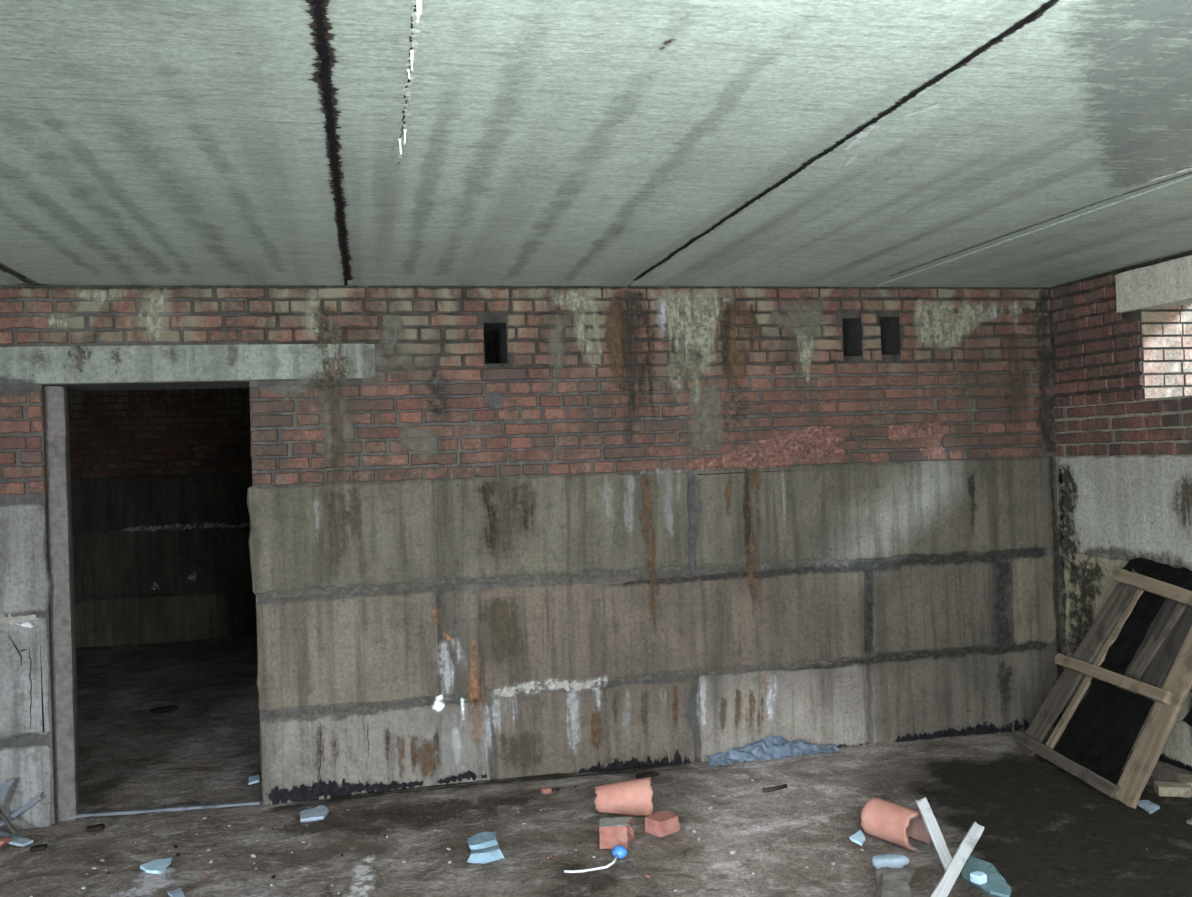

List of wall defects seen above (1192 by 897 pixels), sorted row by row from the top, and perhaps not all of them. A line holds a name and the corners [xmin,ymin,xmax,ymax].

crack [394,0,422,165]
water stain [892,0,1192,276]
water stain [0,0,1069,559]
corrosion [640,473,659,623]
water stain [623,250,1192,709]
crack [8,635,32,724]
corrosion [432,611,484,740]